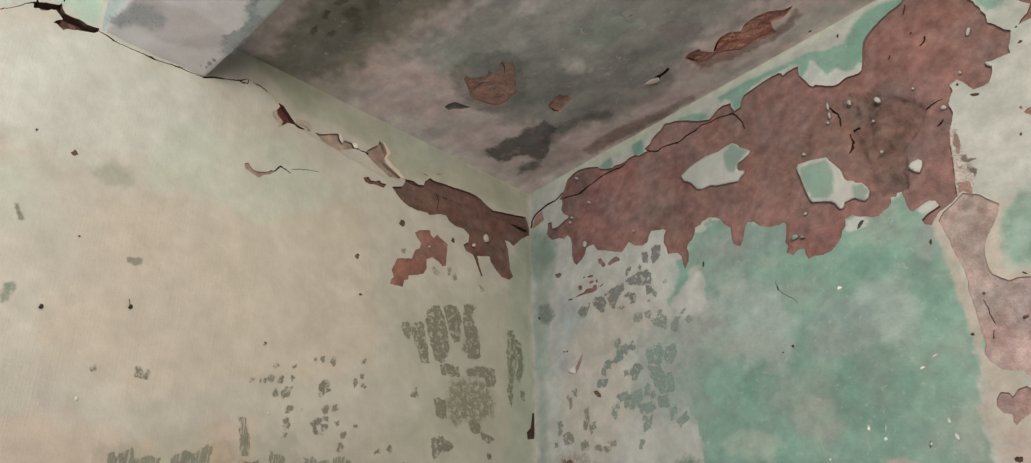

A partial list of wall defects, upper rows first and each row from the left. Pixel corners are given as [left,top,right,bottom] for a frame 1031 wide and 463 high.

spalling [273,0,1031,463]
peeling [260,365,297,437]
peeling [108,446,213,463]
peeling [239,417,285,463]